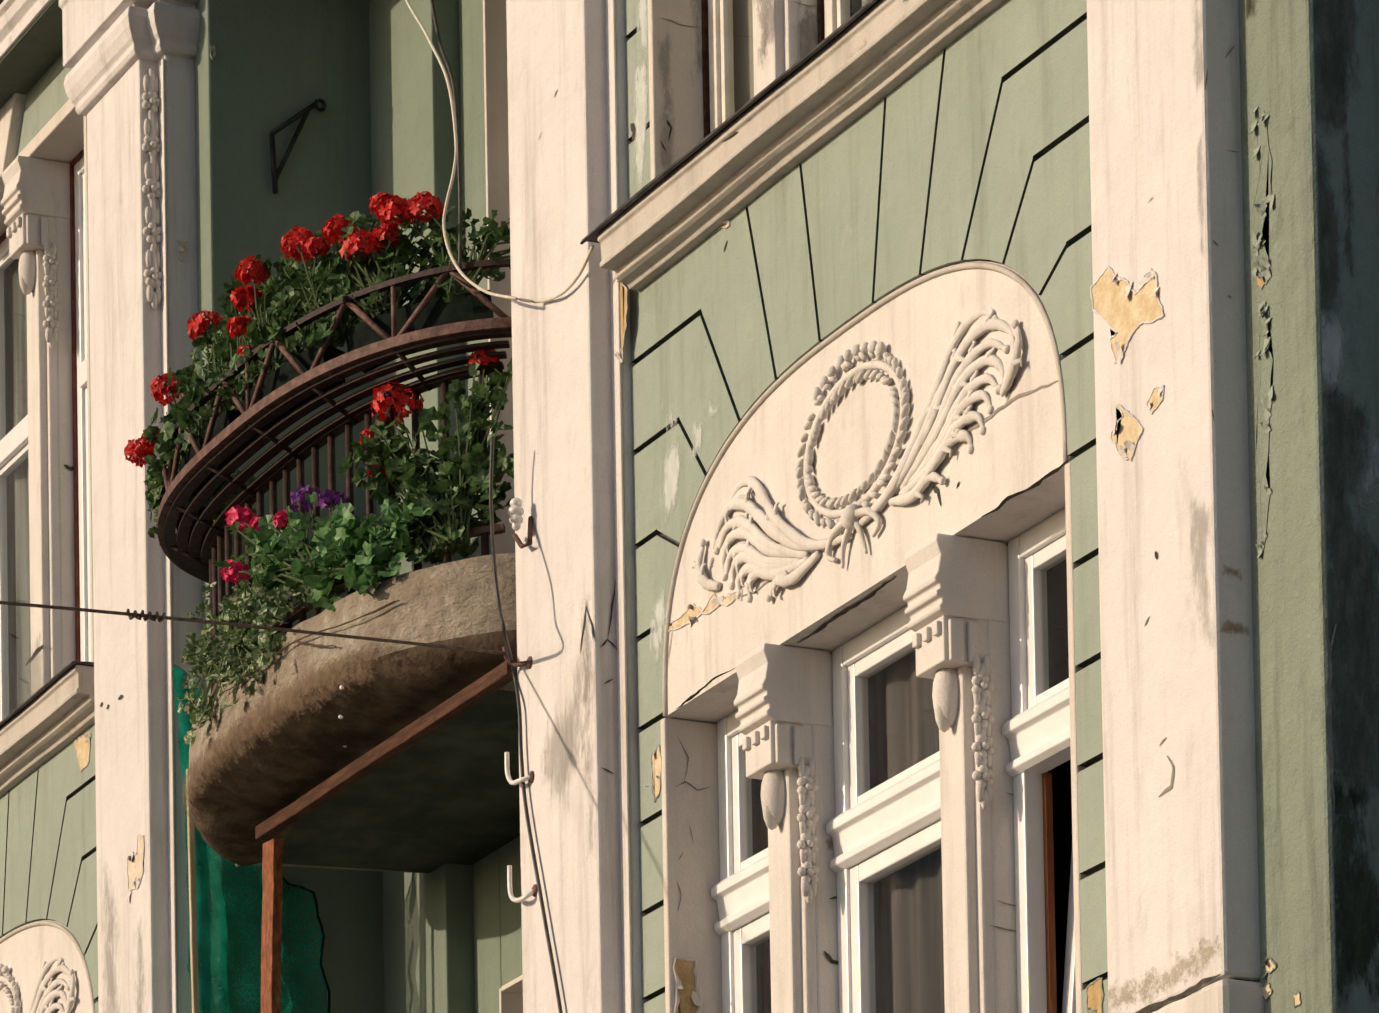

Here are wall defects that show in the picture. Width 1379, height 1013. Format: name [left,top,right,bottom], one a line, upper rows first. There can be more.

flaking render [1090,266,1165,364]
peeling [1249,107,1274,558]
flaking render [1110,385,1165,462]
water stain [1314,0,1379,805]
flaking render [667,589,743,632]
flaking render [125,834,145,902]
flaking render [673,956,705,1013]